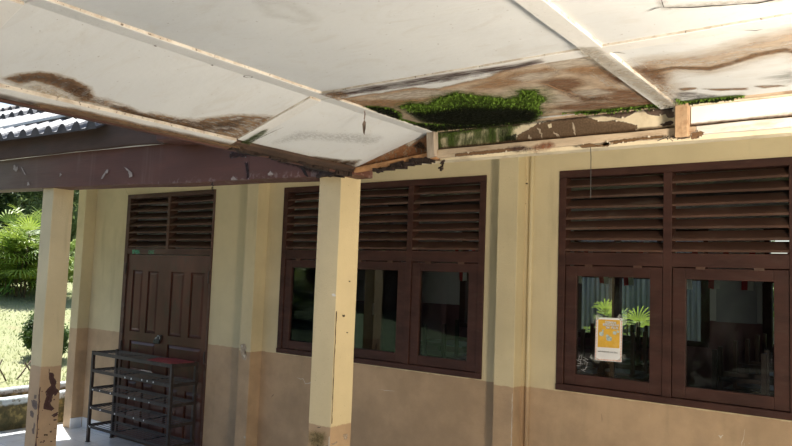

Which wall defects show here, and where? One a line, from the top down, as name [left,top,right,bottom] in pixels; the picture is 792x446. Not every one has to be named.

crack [650,0,773,11]
water stain [323,34,792,132]
water stain [4,72,270,148]
water stain [313,157,358,166]
water stain [439,126,675,152]
peeling [455,108,674,157]
peeling [29,369,59,446]